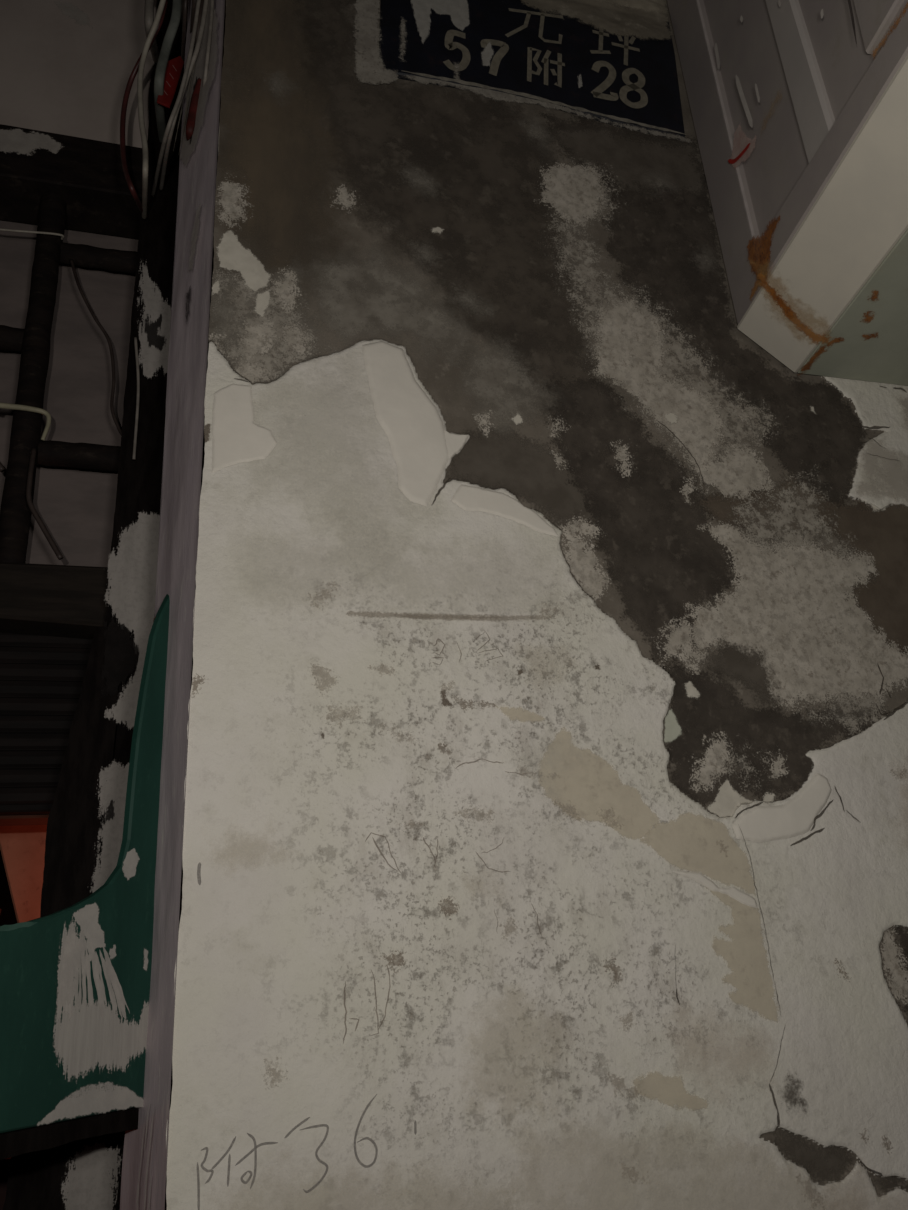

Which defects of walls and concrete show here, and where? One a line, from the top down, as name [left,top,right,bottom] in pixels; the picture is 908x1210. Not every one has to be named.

peeling [0,129,63,156]
peeling [137,260,191,378]
rust [747,216,845,375]
rust [860,290,879,340]
damp [209,0,908,806]
peeling [173,0,908,1026]
peeling [101,512,160,729]
crack [790,787,860,846]
crack [735,802,786,1127]
peeling [759,1126,908,1197]